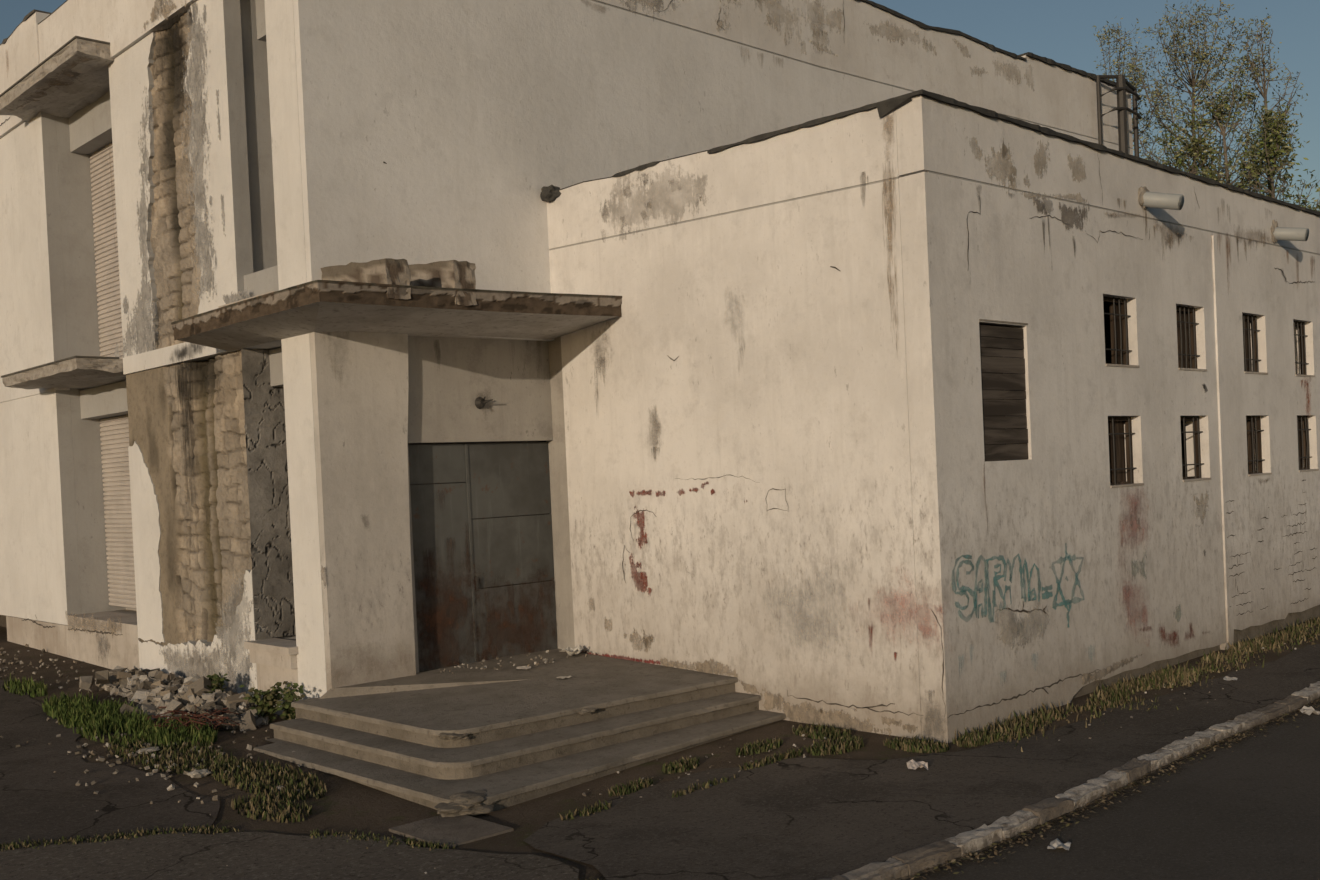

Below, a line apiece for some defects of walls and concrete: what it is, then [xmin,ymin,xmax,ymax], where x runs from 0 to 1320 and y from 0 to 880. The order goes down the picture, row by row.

flaking render [113,0,622,692]
crack [787,609,1099,718]
crack [998,604,1048,615]